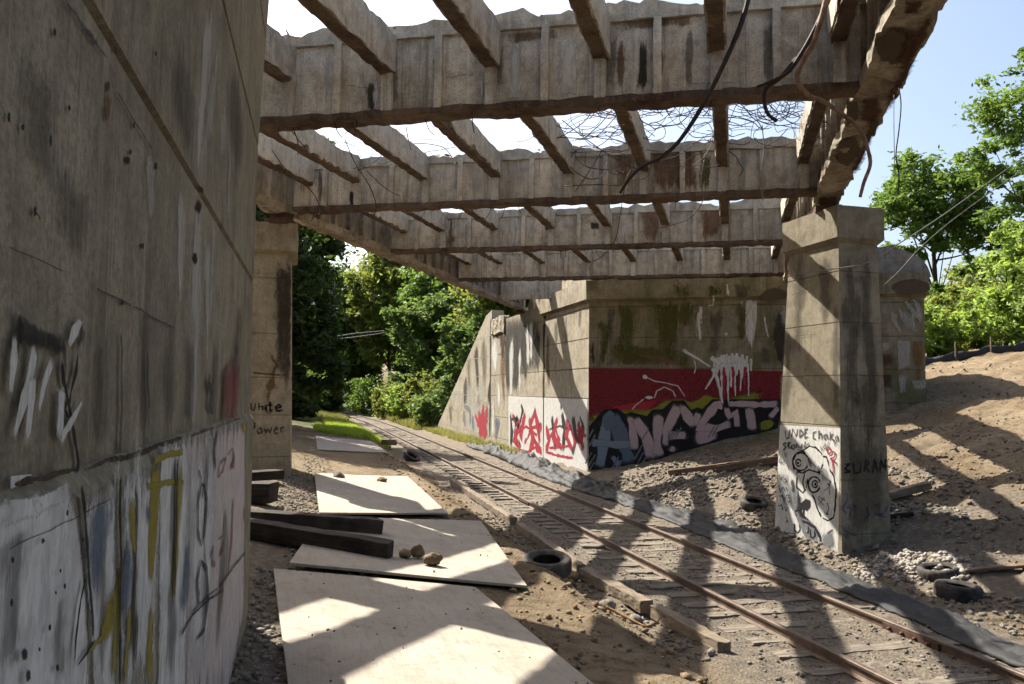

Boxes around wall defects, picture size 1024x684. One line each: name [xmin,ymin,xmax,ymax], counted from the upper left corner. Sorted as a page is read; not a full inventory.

spalling [905,1,922,14]
damp [637,43,647,90]
spalling [874,28,906,65]
damp [367,80,381,109]
spalling [837,95,883,166]
damp [277,264,291,369]
damp [591,284,730,366]